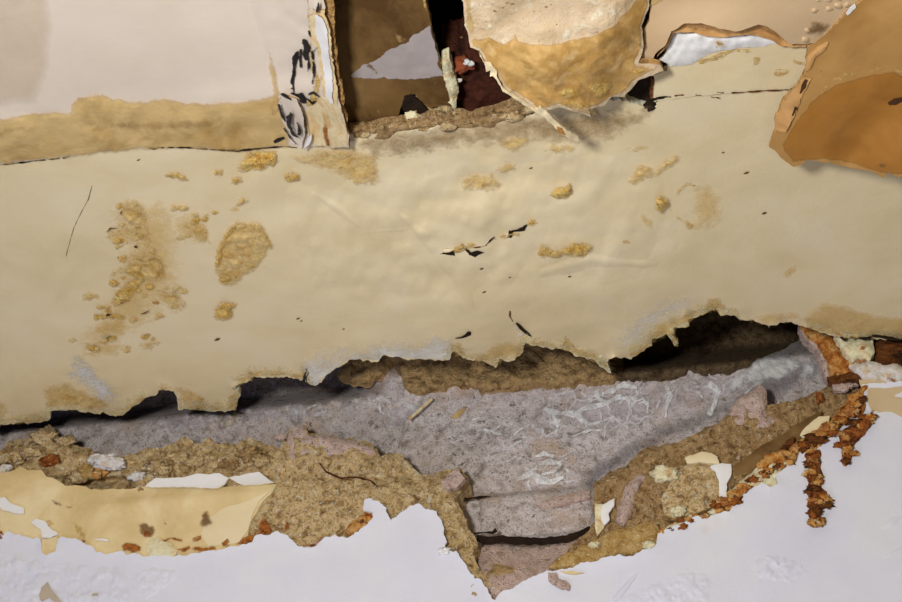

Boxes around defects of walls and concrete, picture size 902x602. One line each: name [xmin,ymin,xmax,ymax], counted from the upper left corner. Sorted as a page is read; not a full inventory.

leakage [0,31,319,164]
spalling [347,47,535,140]
peeling [657,0,902,178]
spalling [0,336,902,600]
spalling [305,309,800,396]
corrosion [659,325,879,534]